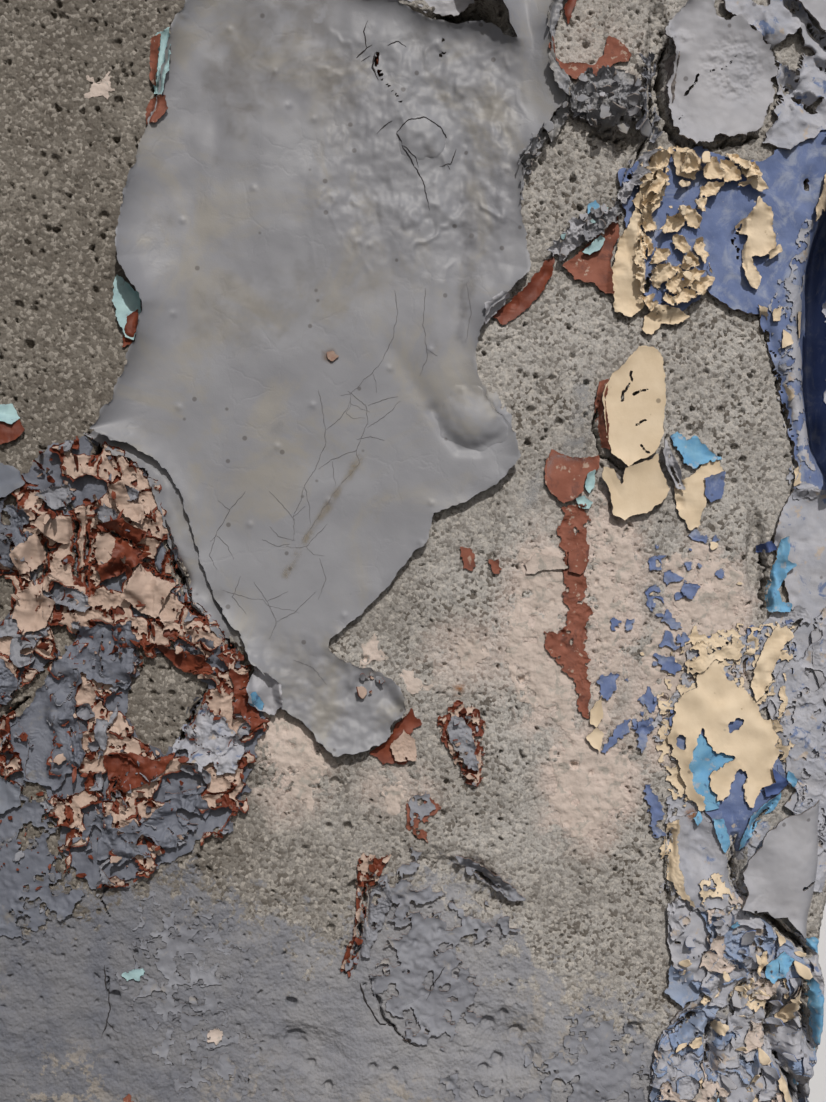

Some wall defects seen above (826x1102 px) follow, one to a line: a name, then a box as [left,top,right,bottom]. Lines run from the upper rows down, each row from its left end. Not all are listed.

crack [356,21,456,210]
peeling [656,0,826,150]
peeling [735,196,783,289]
peeling [758,174,826,500]
crack [209,288,434,639]
peeling [0,0,769,889]
crack [140,520,207,619]
peeling [544,346,826,1102]
peeling [455,855,526,901]
crack [360,984,418,1047]